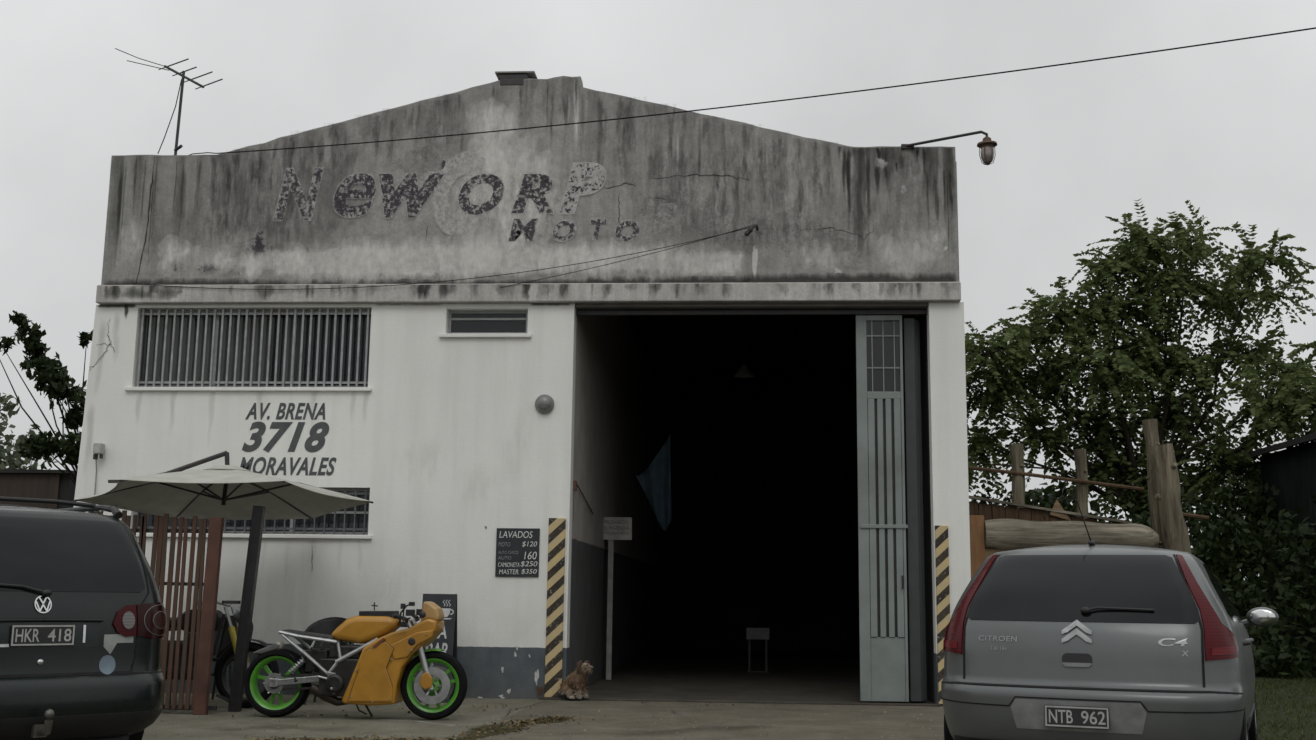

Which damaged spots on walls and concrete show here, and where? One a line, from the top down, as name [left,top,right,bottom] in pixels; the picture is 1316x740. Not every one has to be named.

water stain [568,86,579,141]
water stain [843,147,897,212]
water stain [917,147,953,199]
water stain [99,246,956,316]